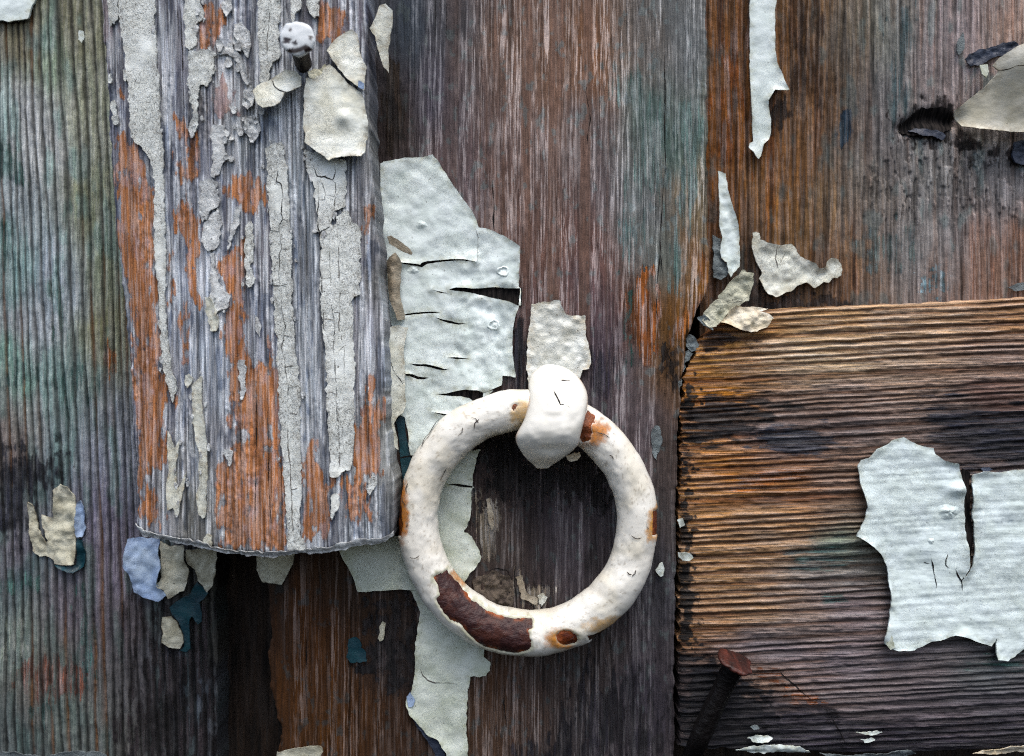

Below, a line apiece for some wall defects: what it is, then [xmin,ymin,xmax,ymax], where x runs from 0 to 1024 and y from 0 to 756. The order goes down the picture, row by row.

peeling [748,0,789,159]
peeling [953,43,1024,133]
peeling [697,171,842,330]
peeling [107,0,591,756]
corrosion [566,410,610,462]
peeling [27,484,87,573]
peeling [856,437,1024,661]
crack [924,468,973,590]
corrosion [434,570,533,653]
corrosion [547,617,619,649]